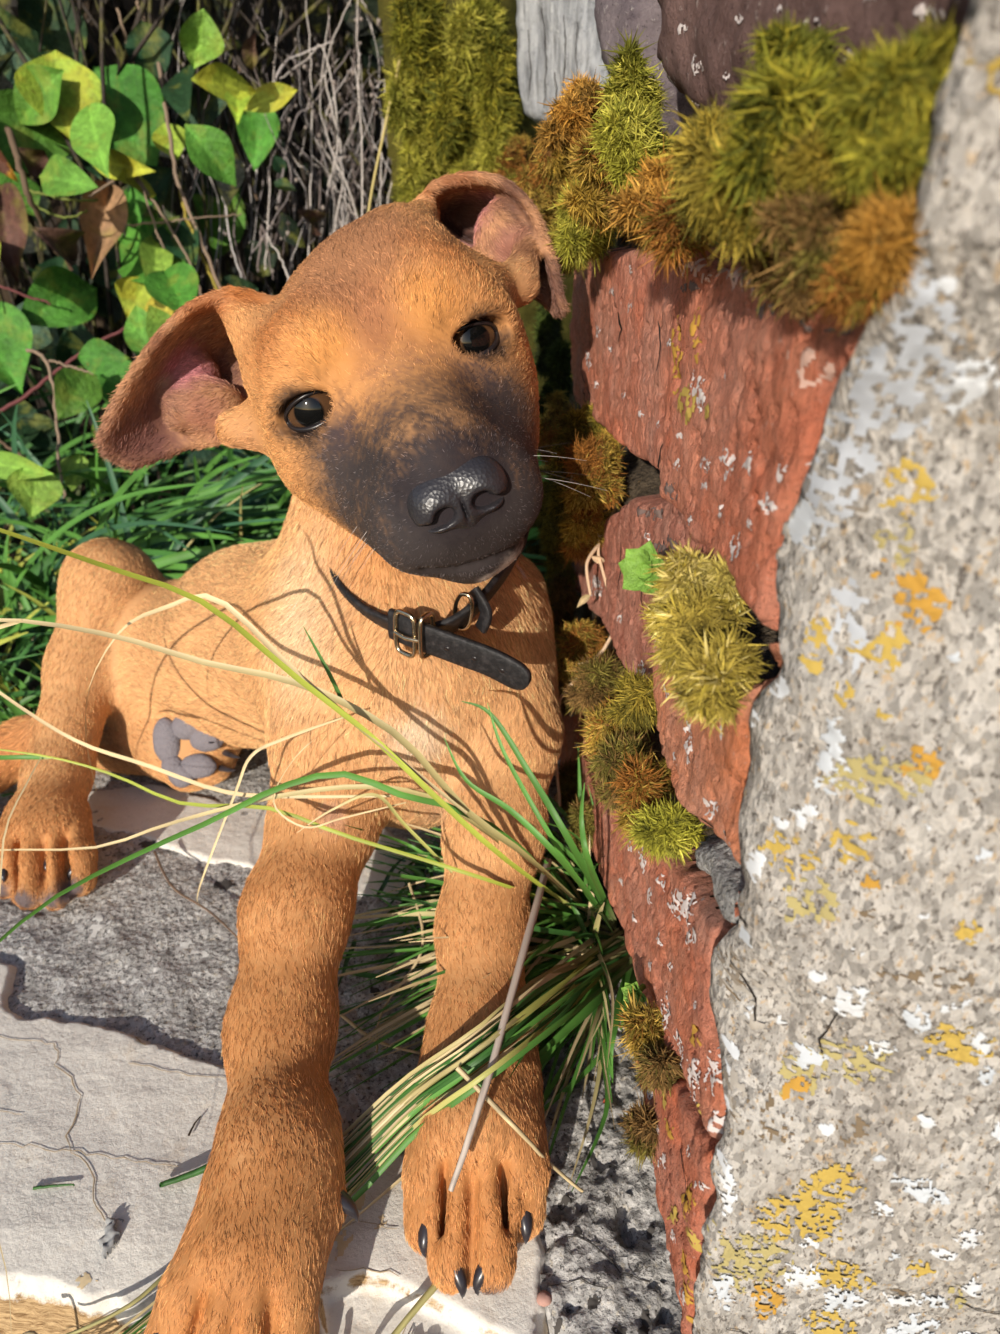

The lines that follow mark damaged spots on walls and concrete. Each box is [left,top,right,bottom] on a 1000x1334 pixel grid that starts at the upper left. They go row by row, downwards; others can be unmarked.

spalling [175,940,209,957]
crack [0,1036,178,1221]
spalling [558,1195,573,1210]